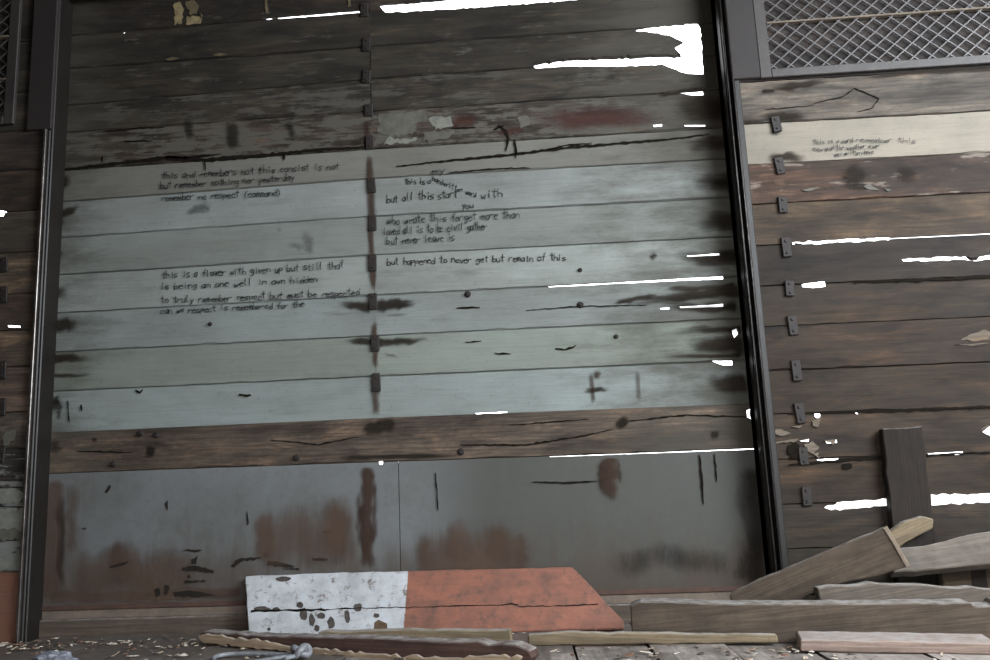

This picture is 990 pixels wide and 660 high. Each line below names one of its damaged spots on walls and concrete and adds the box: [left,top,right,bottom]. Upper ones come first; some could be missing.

rust [599,458,621,497]
peeling [0,487,23,542]
rust [359,468,376,563]